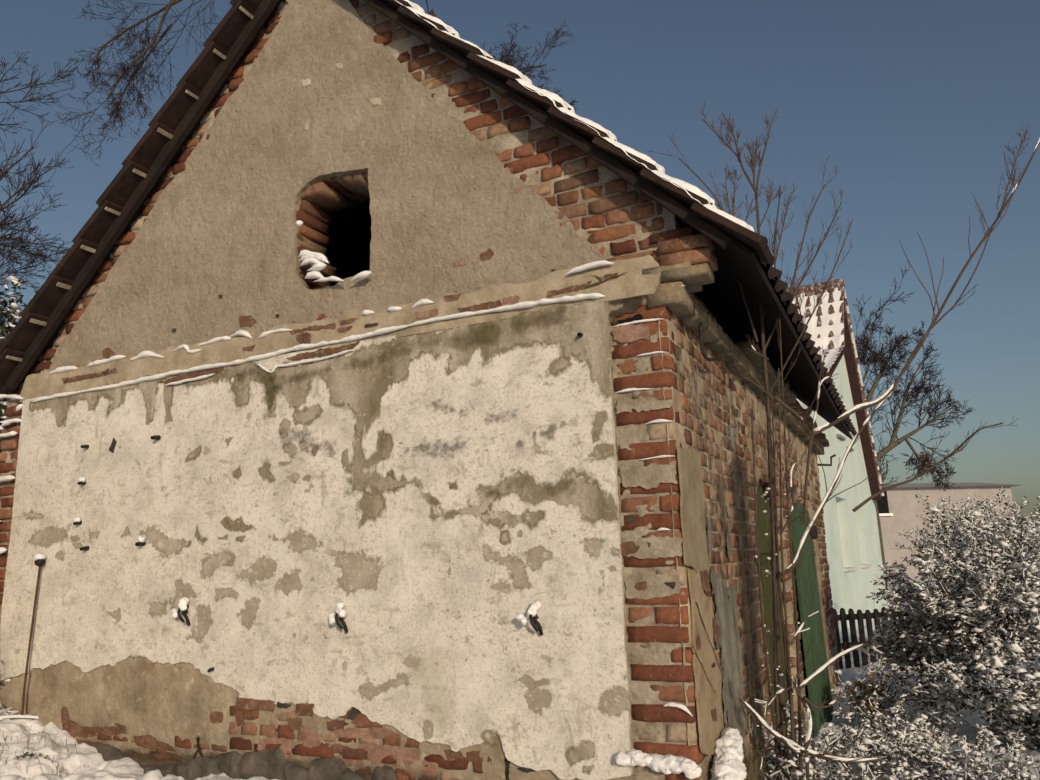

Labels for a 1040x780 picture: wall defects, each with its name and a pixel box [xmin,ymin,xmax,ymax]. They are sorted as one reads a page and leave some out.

peeling [23,273,683,600]
peeling [120,516,303,643]
peeling [697,513,750,743]
spalling [61,707,175,757]
spalling [209,673,498,777]
spalling [509,767,551,780]
peeling [518,674,552,715]
peeling [565,740,595,773]
peeling [598,686,631,717]